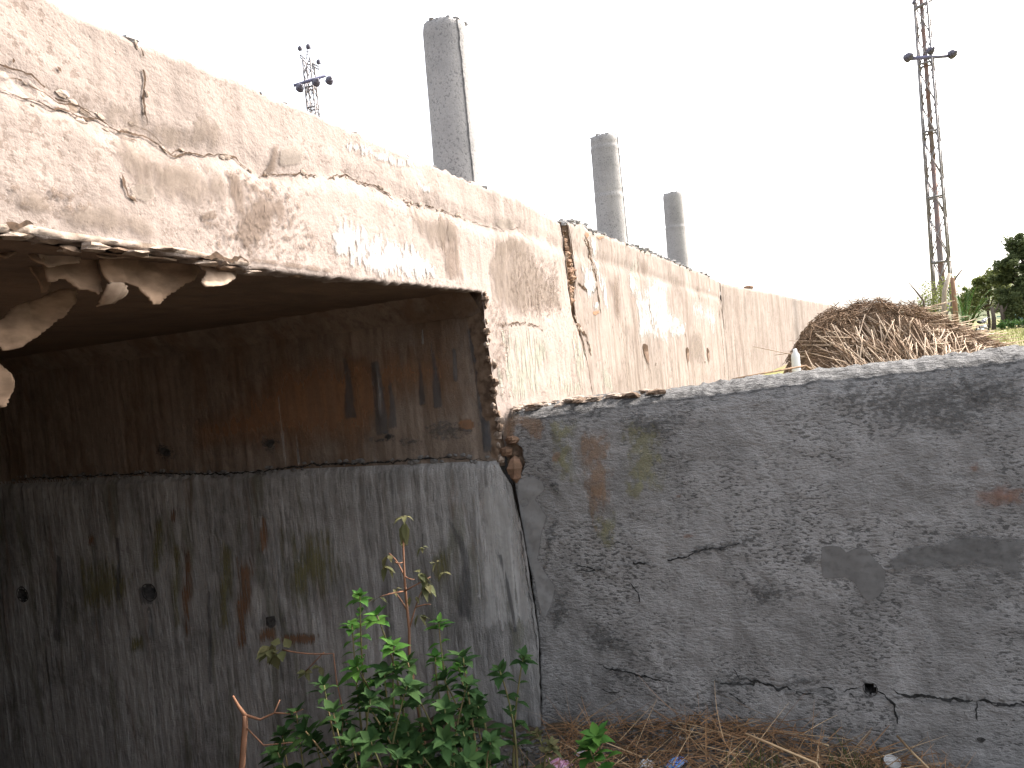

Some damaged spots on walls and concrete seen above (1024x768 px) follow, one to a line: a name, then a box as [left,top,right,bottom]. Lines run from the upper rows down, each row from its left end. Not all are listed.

crack [559,222,601,395]
spalling [467,292,671,470]
leakage [821,536,1024,601]
crack [600,664,662,693]
crack [714,669,1024,724]